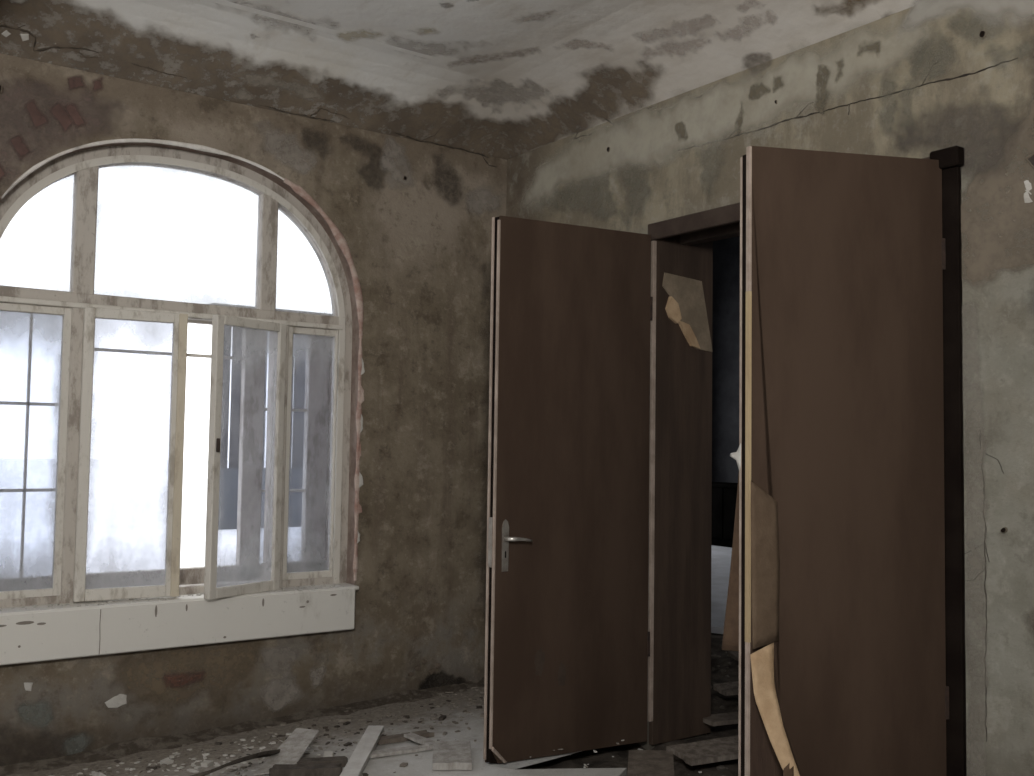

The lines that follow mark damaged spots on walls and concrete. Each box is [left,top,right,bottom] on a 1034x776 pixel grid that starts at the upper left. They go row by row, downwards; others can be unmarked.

damp [0,0,715,202]
damp [737,54,783,134]
damp [816,61,843,113]
crack [673,57,1017,153]
damp [859,42,880,54]
flaking render [961,98,1034,284]